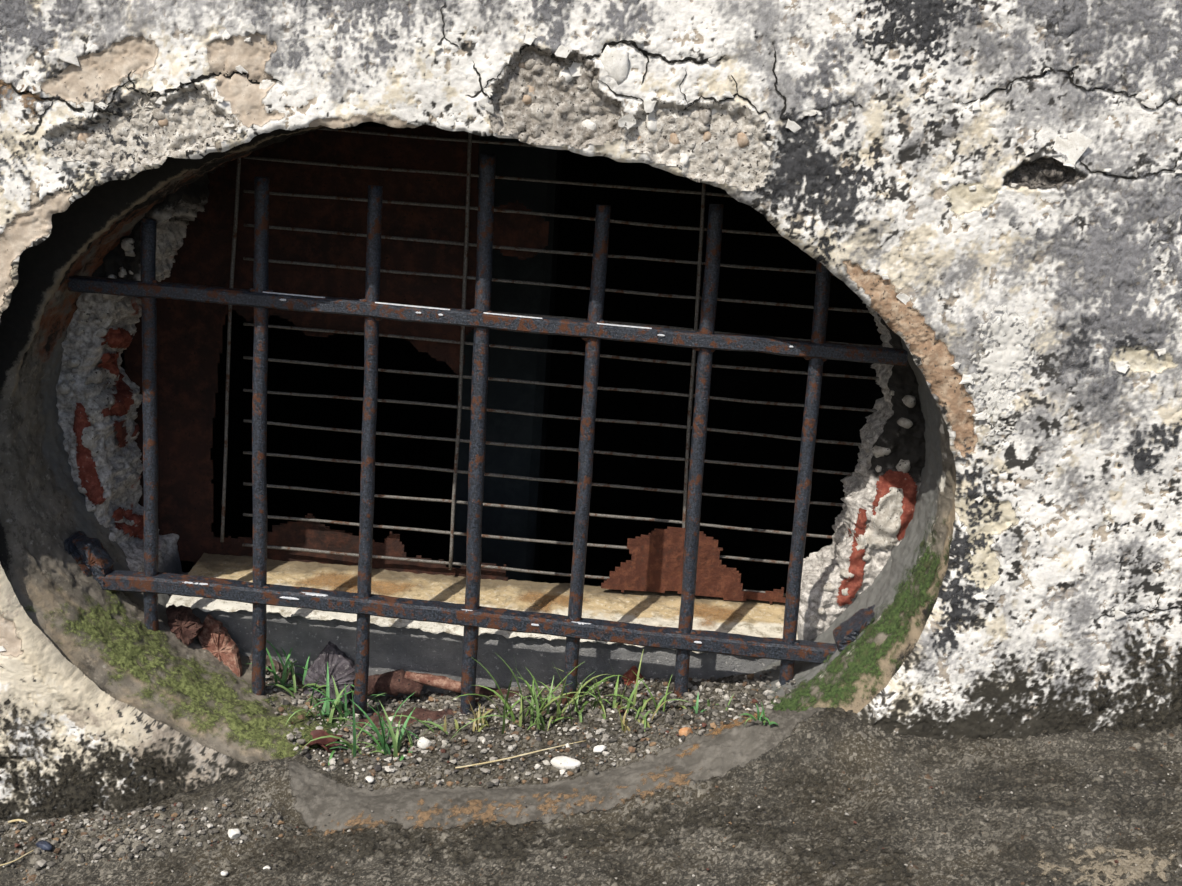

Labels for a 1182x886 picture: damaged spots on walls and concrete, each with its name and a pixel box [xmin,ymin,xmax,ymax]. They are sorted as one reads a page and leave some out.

crack [0,65,282,135]
spalling [16,23,290,177]
spalling [478,45,775,191]
crack [432,2,863,138]
crack [958,66,1182,110]
spalling [941,131,1093,218]
rust [303,574,408,595]
rust [520,593,569,611]
rust [694,604,736,626]
flaking render [836,470,917,606]
leakage [1043,621,1182,733]
leakage [0,695,200,821]